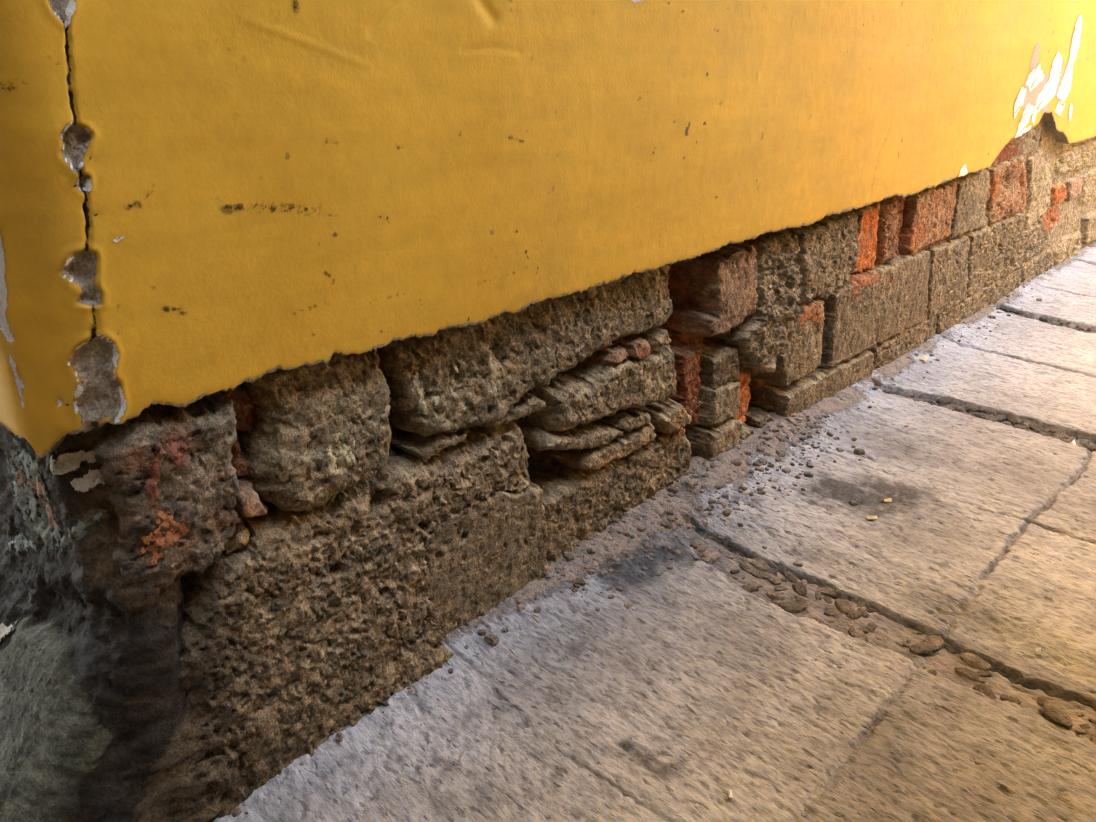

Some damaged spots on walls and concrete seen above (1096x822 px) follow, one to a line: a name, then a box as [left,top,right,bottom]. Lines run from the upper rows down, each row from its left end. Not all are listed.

crack [49,0,127,428]
peeling [0,15,1094,552]